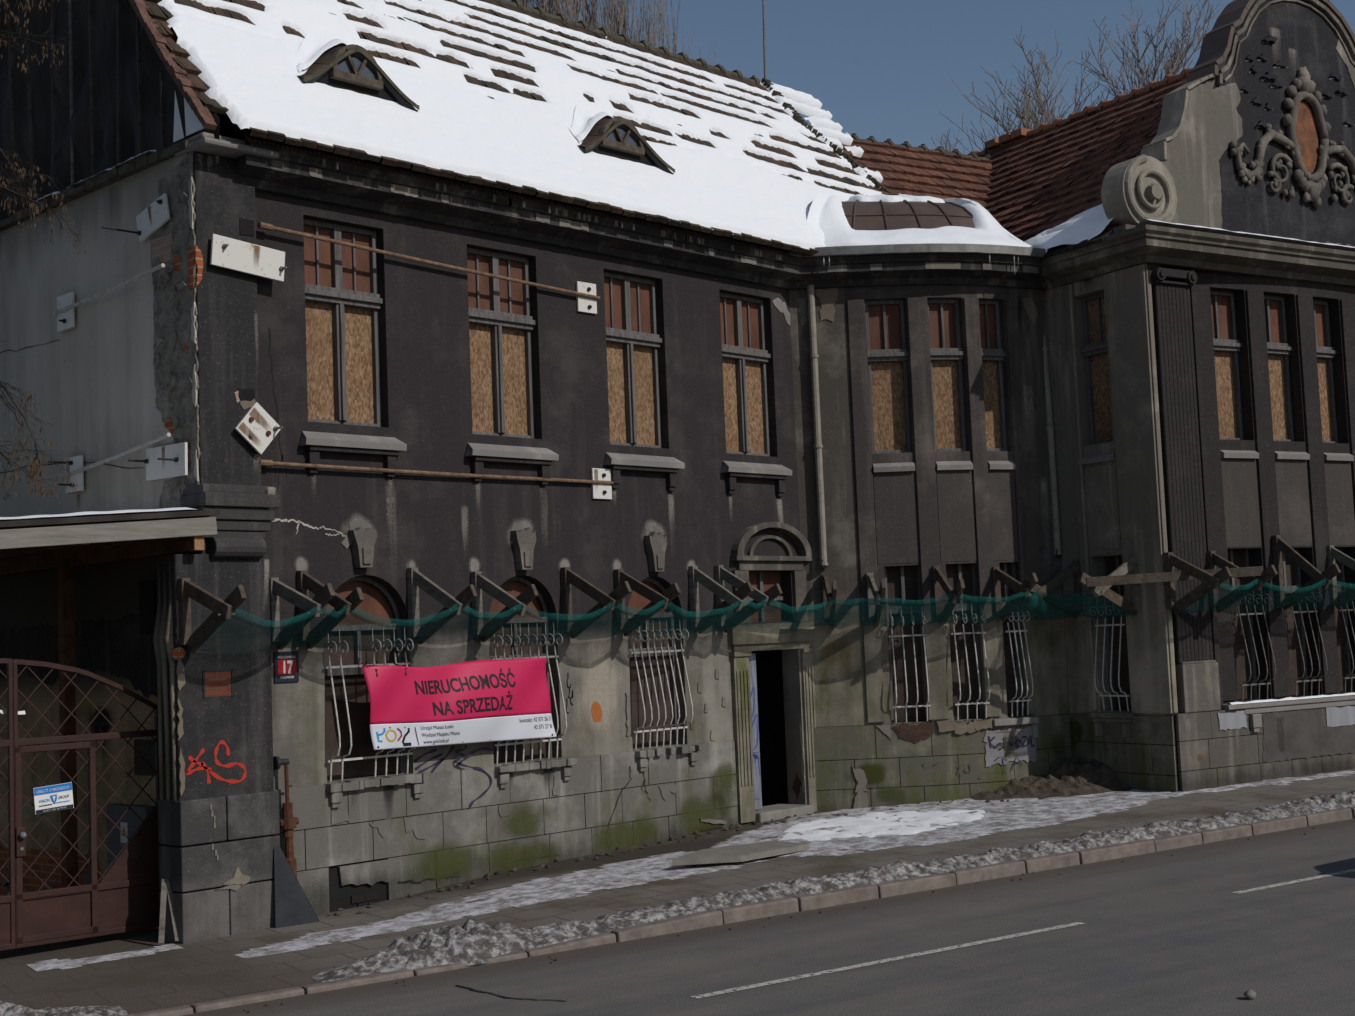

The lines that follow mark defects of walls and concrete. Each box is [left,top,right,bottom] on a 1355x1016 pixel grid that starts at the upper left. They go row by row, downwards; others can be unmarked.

peeling [1335,38,1355,89]
flaking render [150,151,203,509]